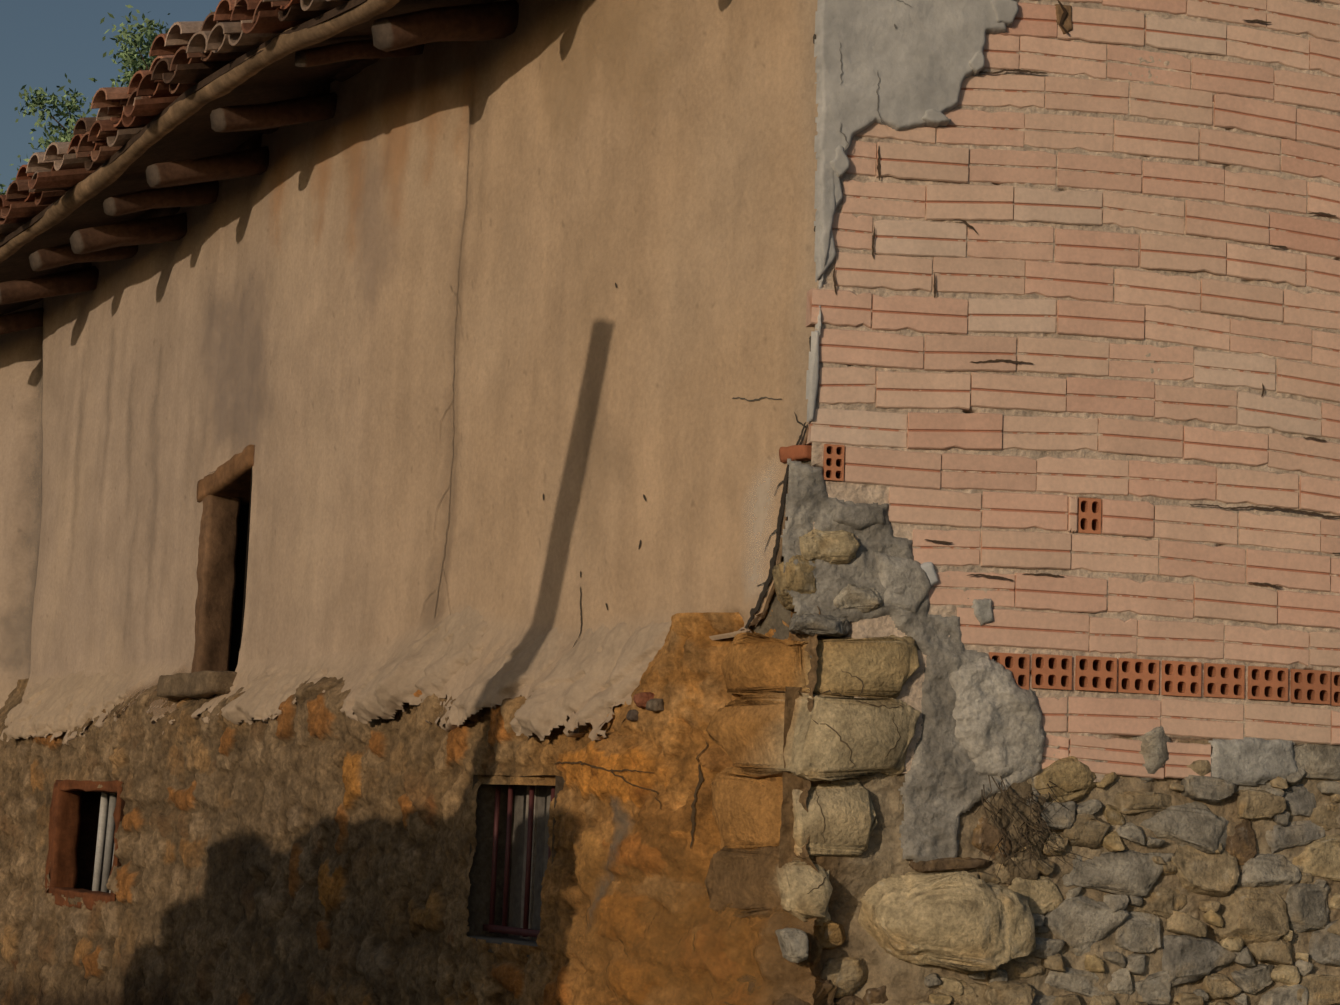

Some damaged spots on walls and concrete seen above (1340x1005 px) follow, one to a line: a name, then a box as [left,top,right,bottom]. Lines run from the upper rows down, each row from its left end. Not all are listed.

spalling [1055,0,1073,35]
peeling [813,0,1019,289]
crack [732,395,780,403]
spalling [745,305,822,640]
spalling [626,692,664,721]
crack [808,670,901,765]
crack [555,761,662,810]